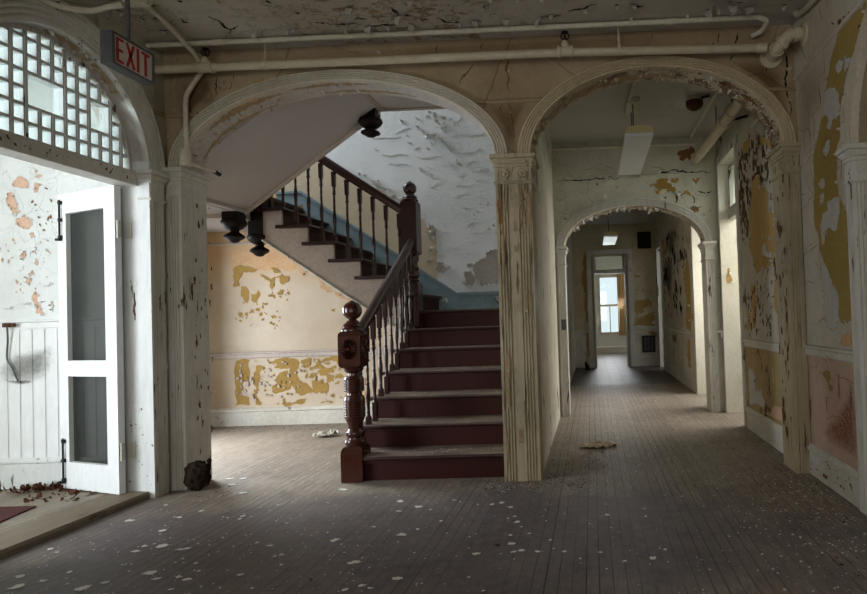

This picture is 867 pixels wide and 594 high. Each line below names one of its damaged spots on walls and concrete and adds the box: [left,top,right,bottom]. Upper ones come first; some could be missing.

peeling [0,167,54,316]
peeling [230,248,352,329]
peeling [405,111,463,167]
peeling [581,253,590,356]
peeling [573,206,667,232]
peeling [635,230,691,368]
peeling [650,178,700,213]
peeling [692,72,792,438]
peeling [812,1,867,347]
peeling [234,356,348,407]